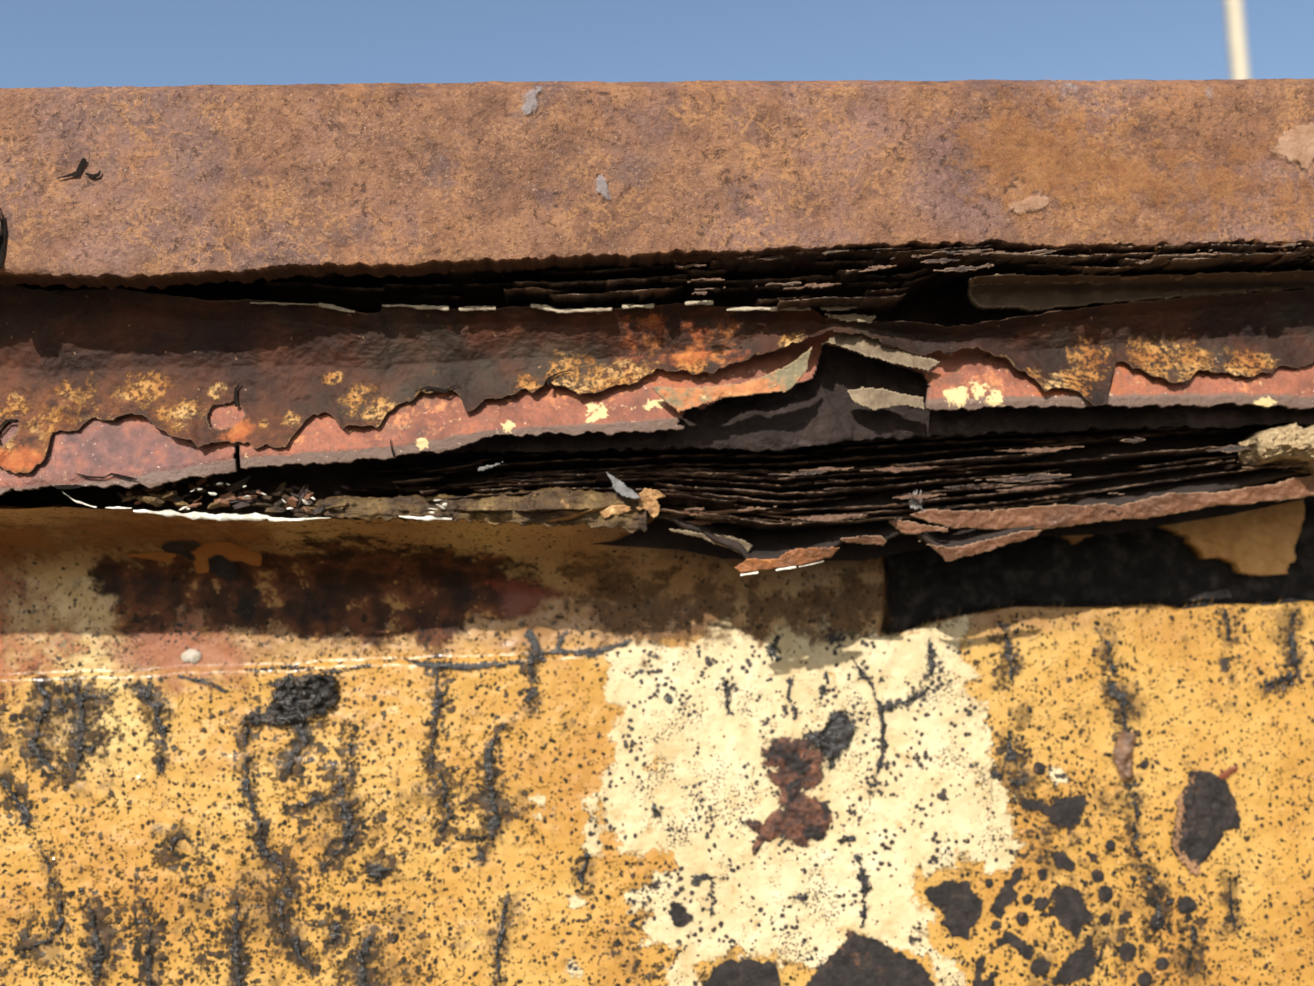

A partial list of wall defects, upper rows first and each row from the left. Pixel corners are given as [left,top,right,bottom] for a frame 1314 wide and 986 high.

spalling [1007,195,1049,213]
crack [0,215,8,268]
peeling [250,241,1314,324]
peeling [341,423,1309,531]
peeling [61,491,331,522]
peeling [127,542,262,573]
peeling [581,497,1314,986]
peeling [527,793,555,820]
corrosion [740,736,833,855]
peeling [568,894,586,909]
peeling [564,957,584,982]